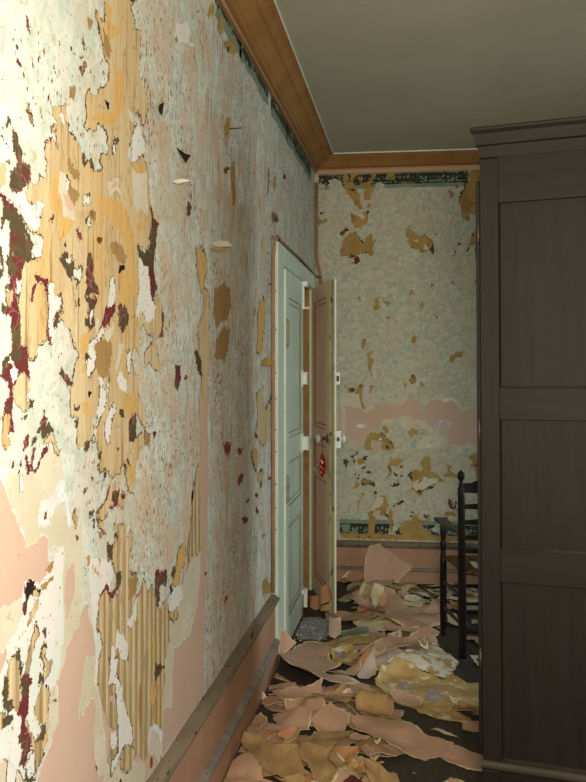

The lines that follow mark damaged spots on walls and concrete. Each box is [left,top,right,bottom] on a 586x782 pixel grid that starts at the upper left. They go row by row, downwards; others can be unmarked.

peeling [199,0,237,55]
peeling [224,162,236,206]
peeling [340,173,377,265]
peeling [406,225,435,255]
peeling [448,170,480,221]
peeling [257,296,266,355]
peeling [0,0,231,782]
peeling [223,386,271,524]
peeling [336,338,478,543]